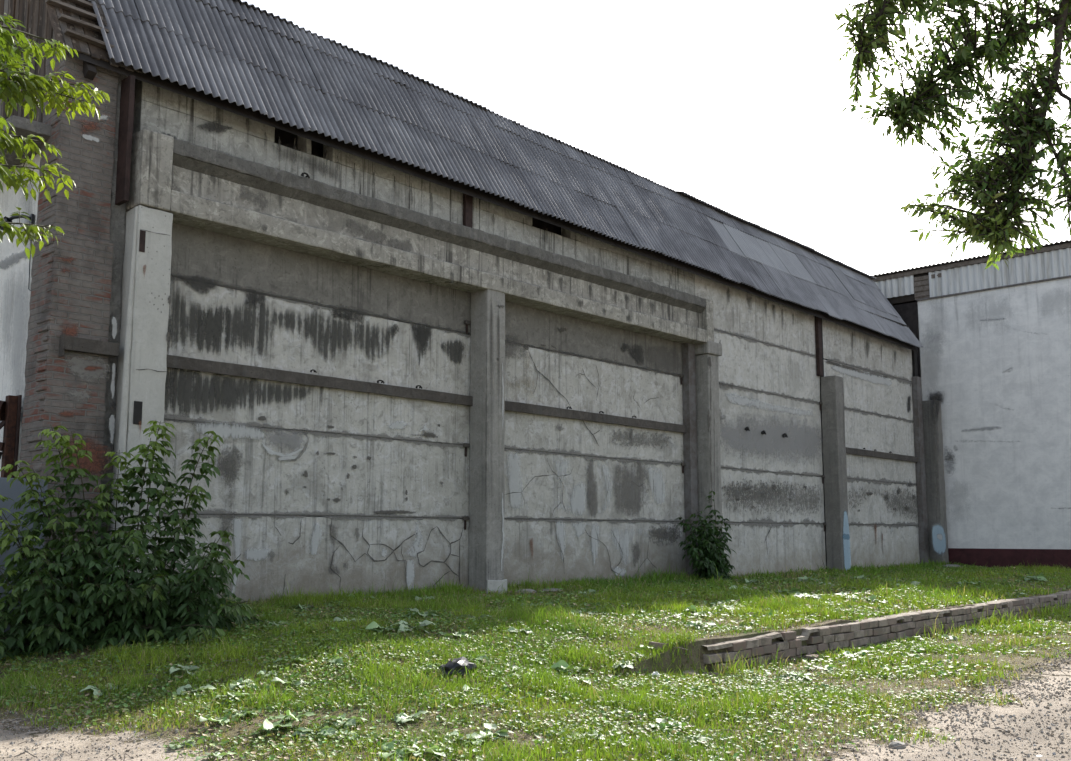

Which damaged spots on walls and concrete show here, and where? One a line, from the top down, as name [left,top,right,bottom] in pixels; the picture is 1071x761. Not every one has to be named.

water stain [198,306,229,353]
crack [528,350,600,444]
crack [330,521,463,589]
crack [506,463,573,562]
water stain [556,460,665,562]
water stain [612,526,676,576]